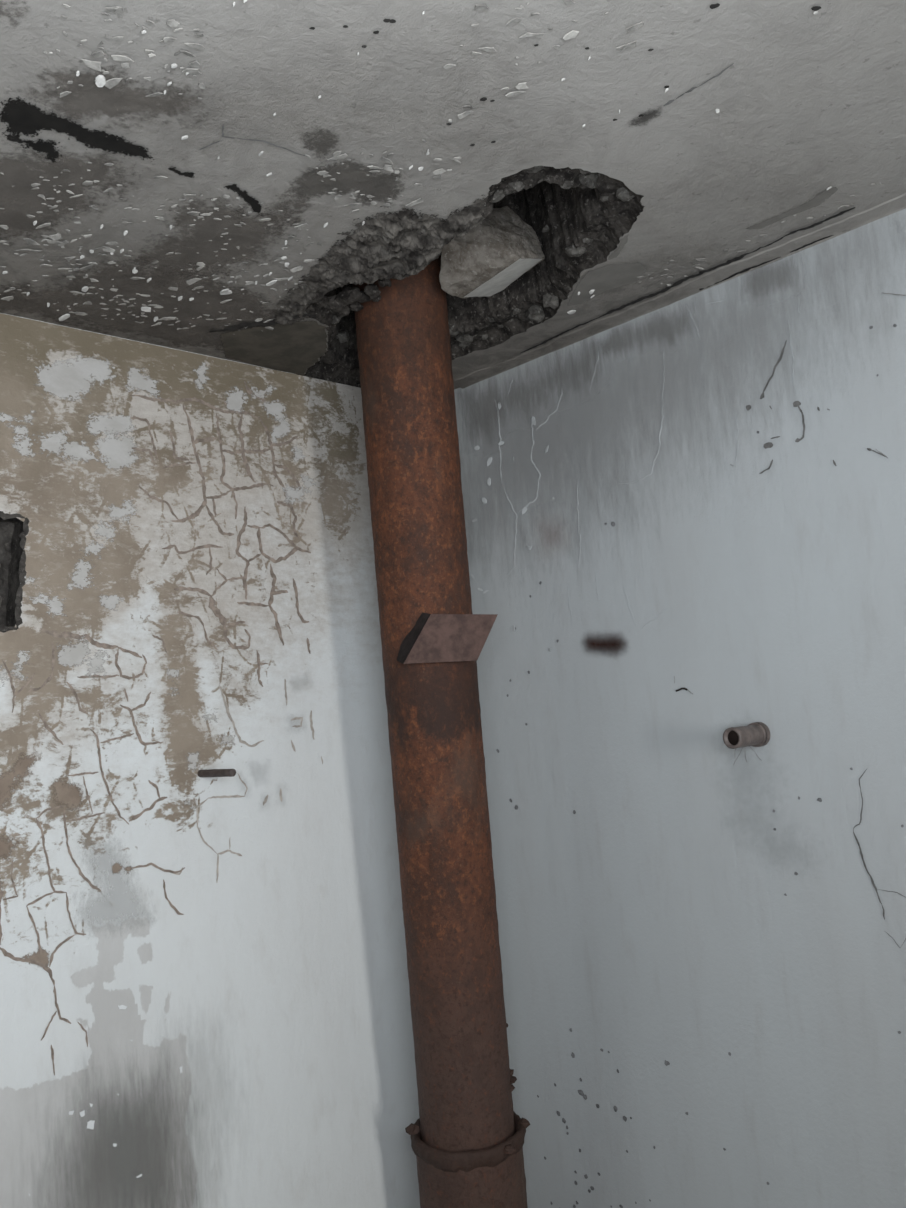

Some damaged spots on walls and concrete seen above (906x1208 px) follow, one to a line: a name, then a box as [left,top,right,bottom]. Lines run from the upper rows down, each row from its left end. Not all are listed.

peeling [43,4,205,99]
peeling [447,82,529,125]
peeling [506,2,579,49]
crack [130,381,323,764]
peeling [0,96,645,1208]
crack [0,628,167,1075]
crack [130,863,185,915]
crack [196,774,283,881]
crack [853,769,906,948]